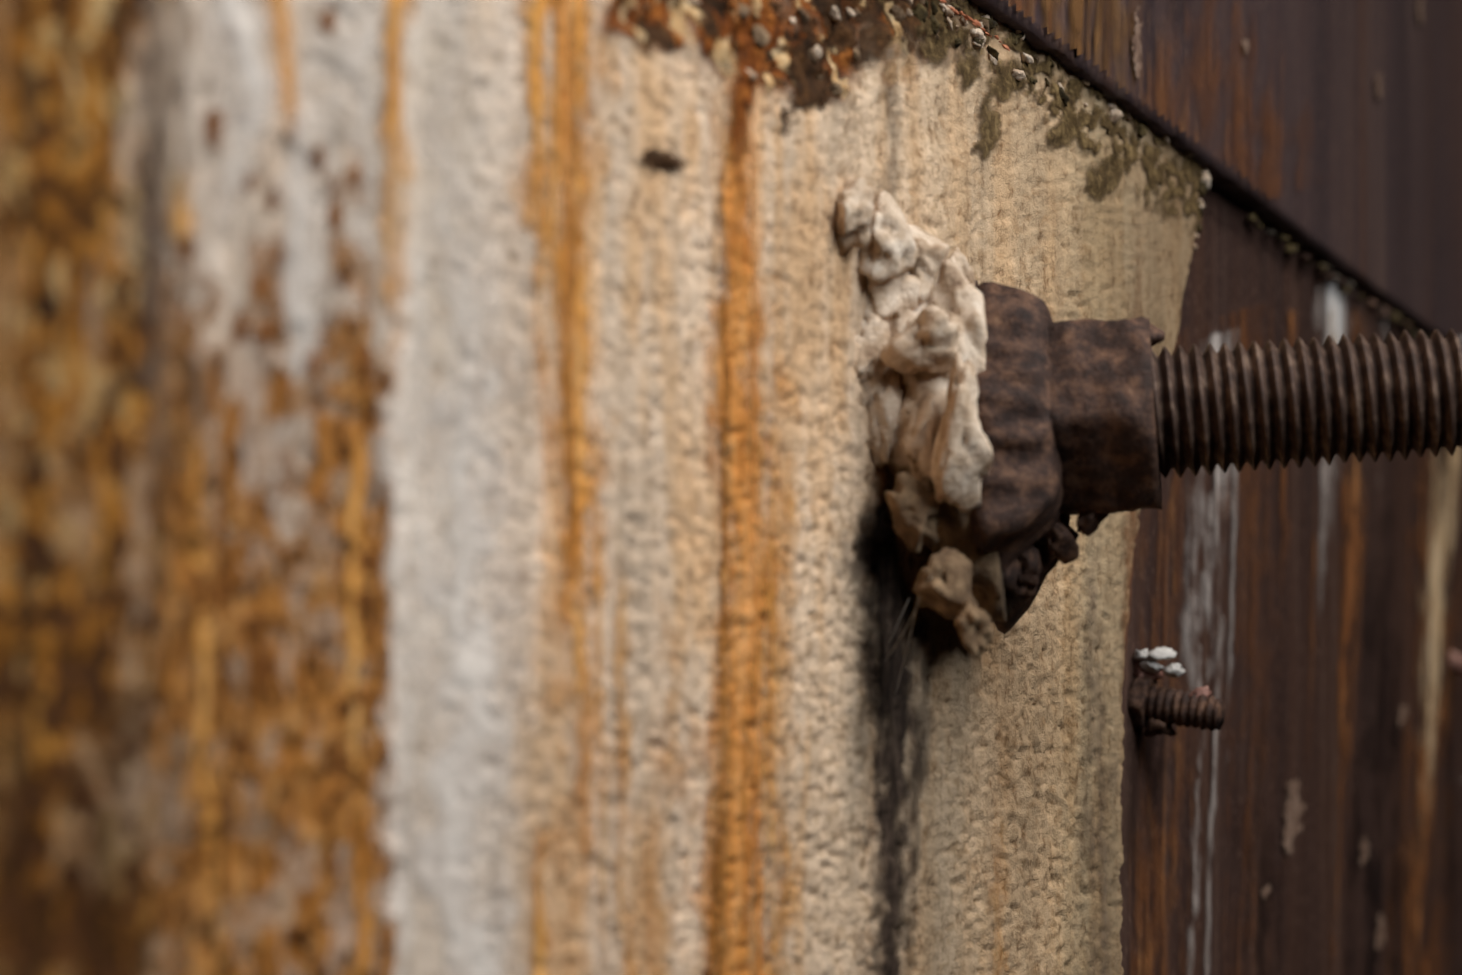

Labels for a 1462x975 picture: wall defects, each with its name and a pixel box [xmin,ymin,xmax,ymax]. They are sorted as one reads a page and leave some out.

rust [383,0,406,242]
spalling [603,0,1211,251]
rust [1043,0,1132,89]
rust [0,0,396,975]
rust [525,0,623,831]
rust [702,114,788,975]
leakage [855,486,925,975]
leakage [1211,333,1229,352]
leakage [1209,464,1236,544]
leakage [1326,281,1356,344]
leakage [1321,457,1363,753]
rust [1405,446,1460,975]